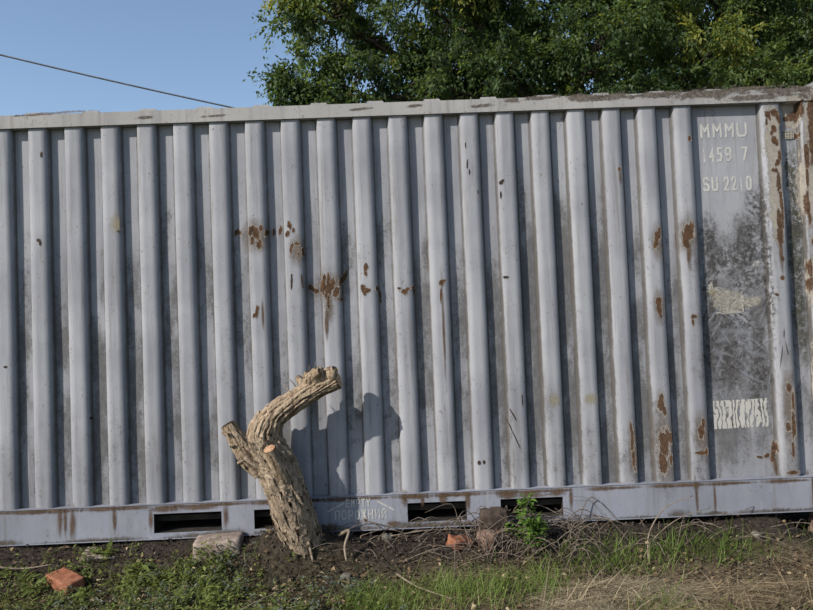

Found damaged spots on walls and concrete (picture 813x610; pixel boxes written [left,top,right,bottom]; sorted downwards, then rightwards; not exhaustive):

rust [764,88,813,281]
rust [234,220,305,258]
rust [652,227,662,250]
rust [680,221,696,263]
rust [804,257,813,294]
rust [290,269,348,335]
rust [654,390,749,510]
rust [756,438,813,502]
rust [399,488,480,508]
rust [495,488,572,505]
rust [0,500,269,535]